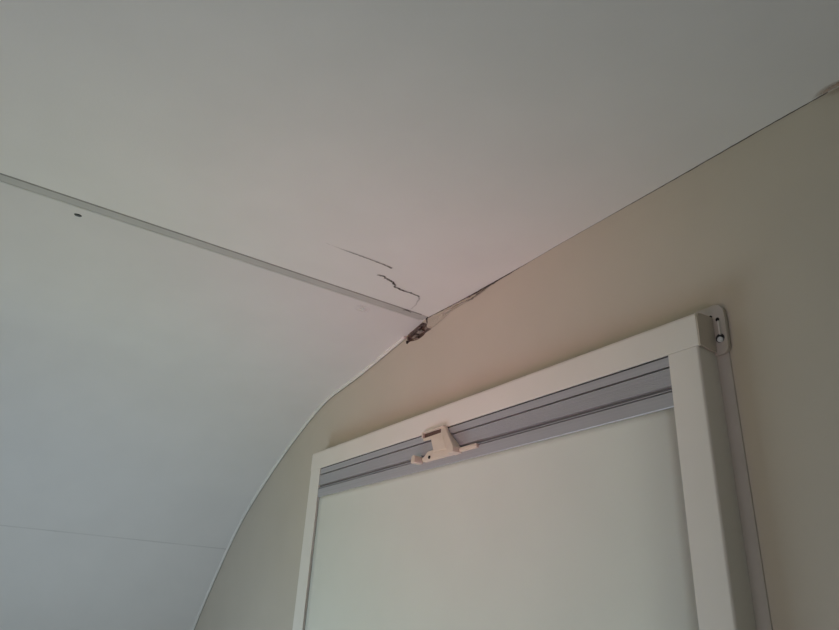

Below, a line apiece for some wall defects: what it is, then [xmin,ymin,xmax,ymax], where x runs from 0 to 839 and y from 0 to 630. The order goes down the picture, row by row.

crack [608,92,828,217]
crack [351,252,419,297]
crack [426,263,527,325]